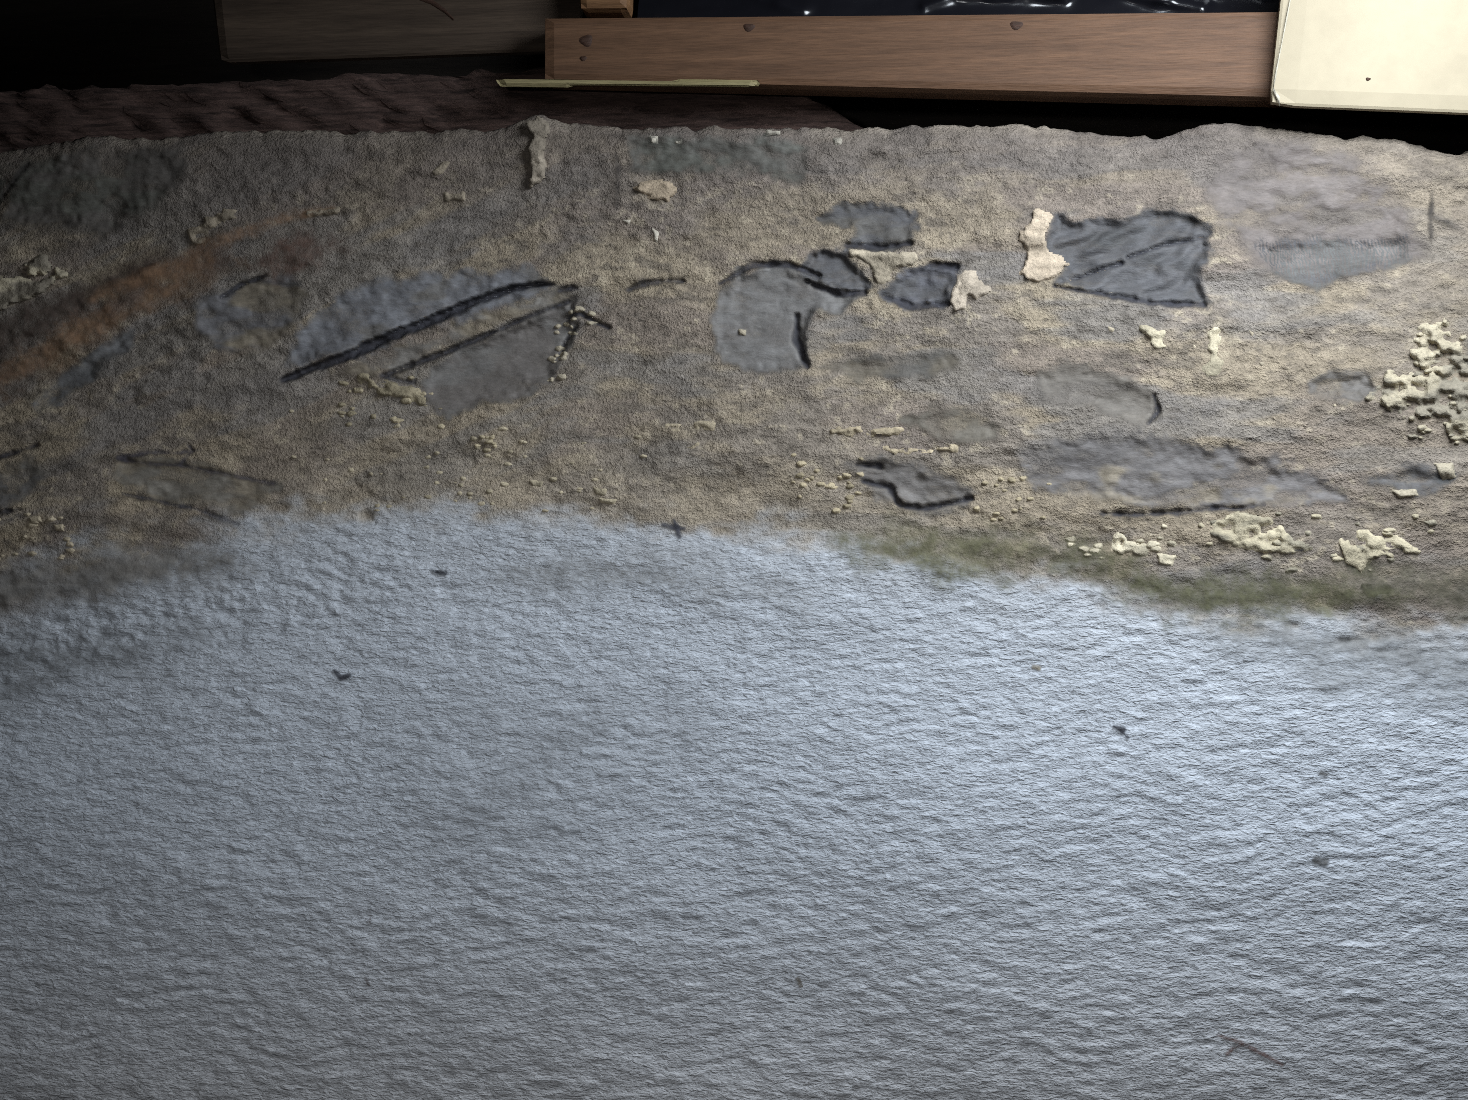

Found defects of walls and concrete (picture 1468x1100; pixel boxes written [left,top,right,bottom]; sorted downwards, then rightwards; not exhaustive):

spalling [1047,143,1422,307]
spalling [711,202,959,372]
spalling [292,267,610,429]
peeling [1139,325,1167,349]
peeling [1193,327,1224,377]
spalling [1309,371,1376,407]
flaking render [423,426,527,506]
spalling [1370,463,1457,534]
flaking render [0,512,75,560]
peeling [662,519,686,538]
flaking render [1330,522,1421,575]